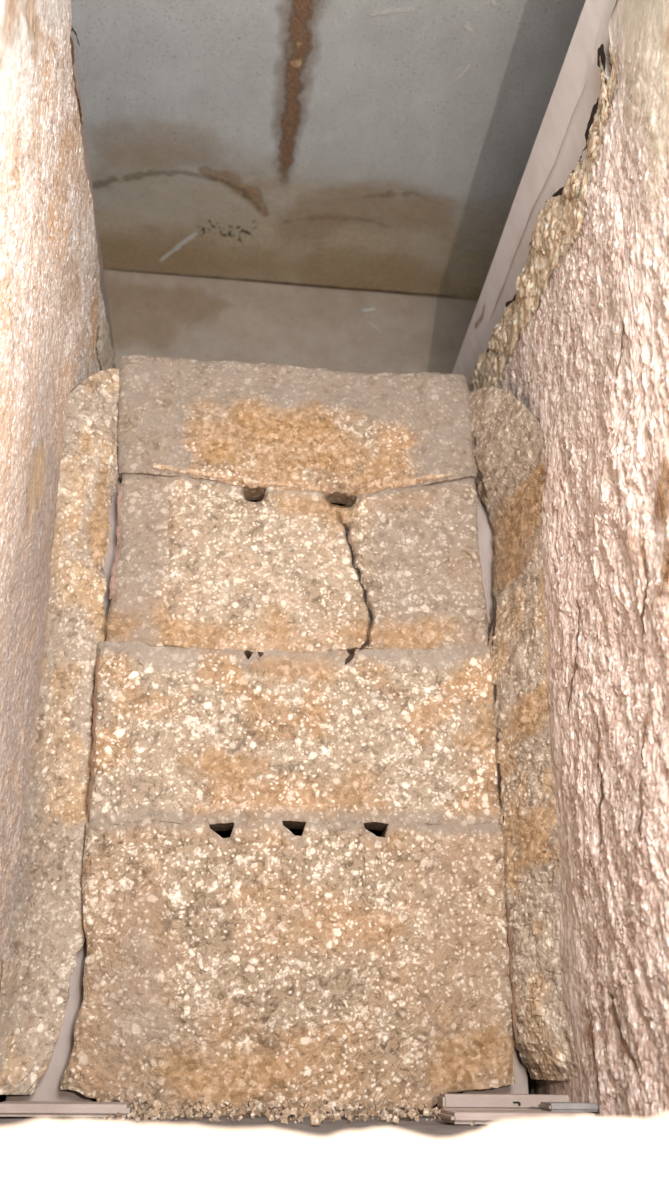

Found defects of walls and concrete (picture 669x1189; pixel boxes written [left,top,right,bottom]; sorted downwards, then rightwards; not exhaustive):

corrosion [279,0,318,177]
damp [98,171,492,300]
spalling [467,44,618,393]
crack [338,517,373,664]